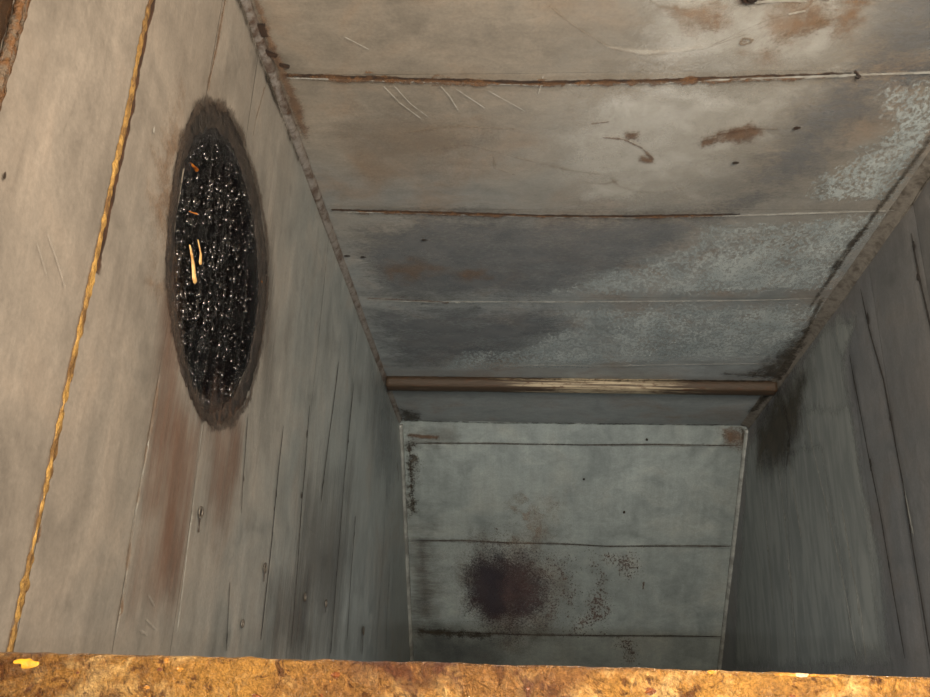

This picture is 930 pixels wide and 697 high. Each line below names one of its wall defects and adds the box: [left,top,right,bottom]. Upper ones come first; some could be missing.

corrosion [331,209,740,219]
corrosion [255,0,852,133]
corrosion [604,133,654,163]
corrosion [702,124,762,147]
damp [561,0,930,202]
corrosion [6,0,155,669]
damp [407,434,437,512]
damp [412,210,894,674]
corrosion [849,355,905,657]
corrosion [465,529,644,665]